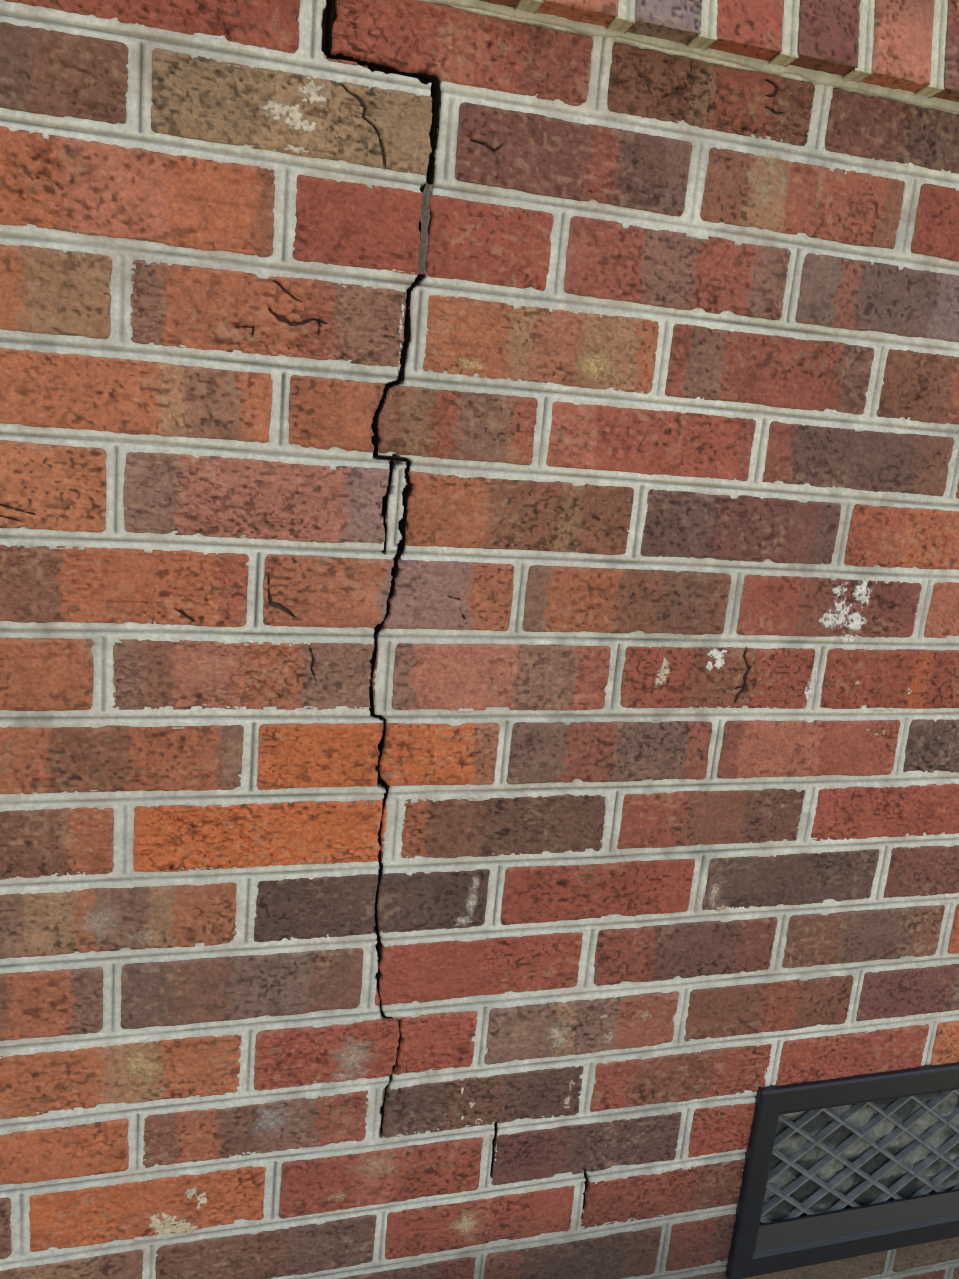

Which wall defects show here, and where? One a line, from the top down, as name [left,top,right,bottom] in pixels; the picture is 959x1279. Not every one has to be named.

crack [471,140,503,151]
crack [325,0,441,1133]
crack [734,648,754,702]
crack [489,1122,497,1176]
crack [580,1169,588,1217]